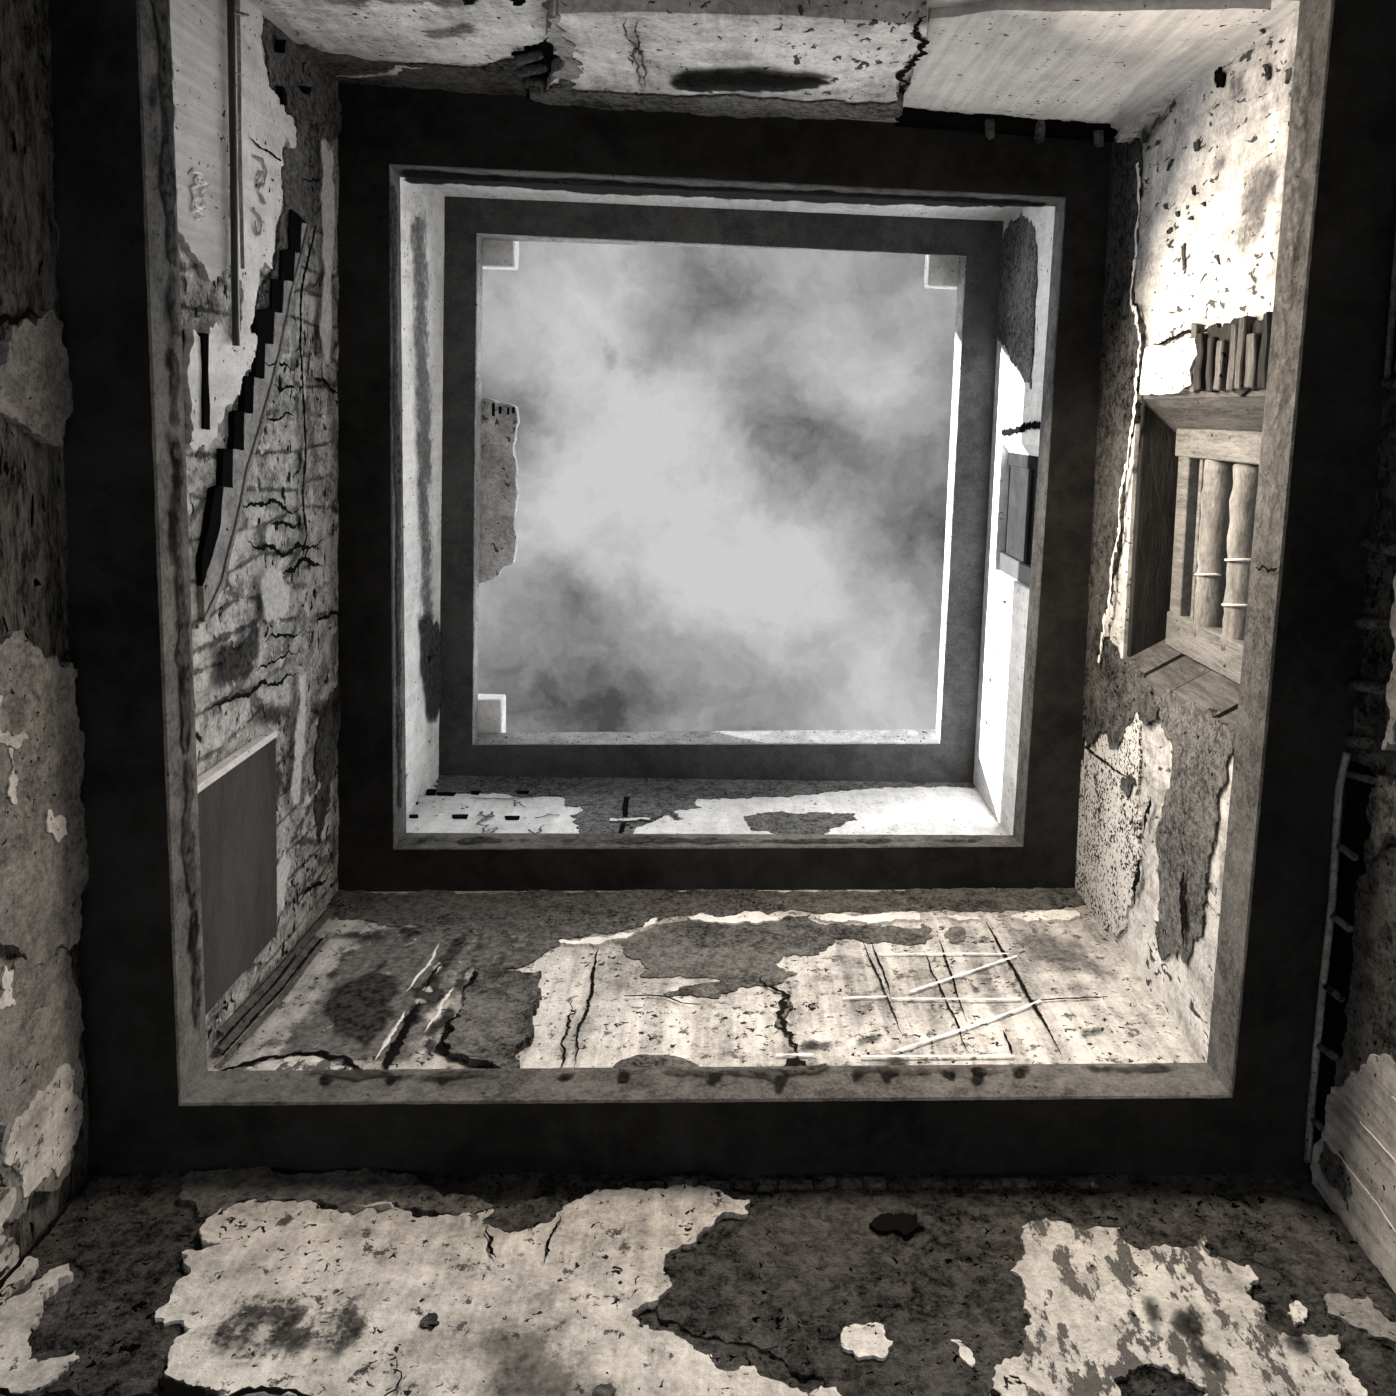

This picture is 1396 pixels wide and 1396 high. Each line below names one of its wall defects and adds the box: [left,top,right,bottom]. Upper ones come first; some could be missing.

spalling [0,0,73,446]
crack [0,306,65,326]
crack [243,498,325,574]
spalling [327,107,1236,1069]
crack [212,610,343,707]
peeling [0,320,1396,1396]
crack [0,1165,100,1289]
crack [0,1387,80,1396]
crack [132,1378,310,1396]
crack [384,1359,402,1396]